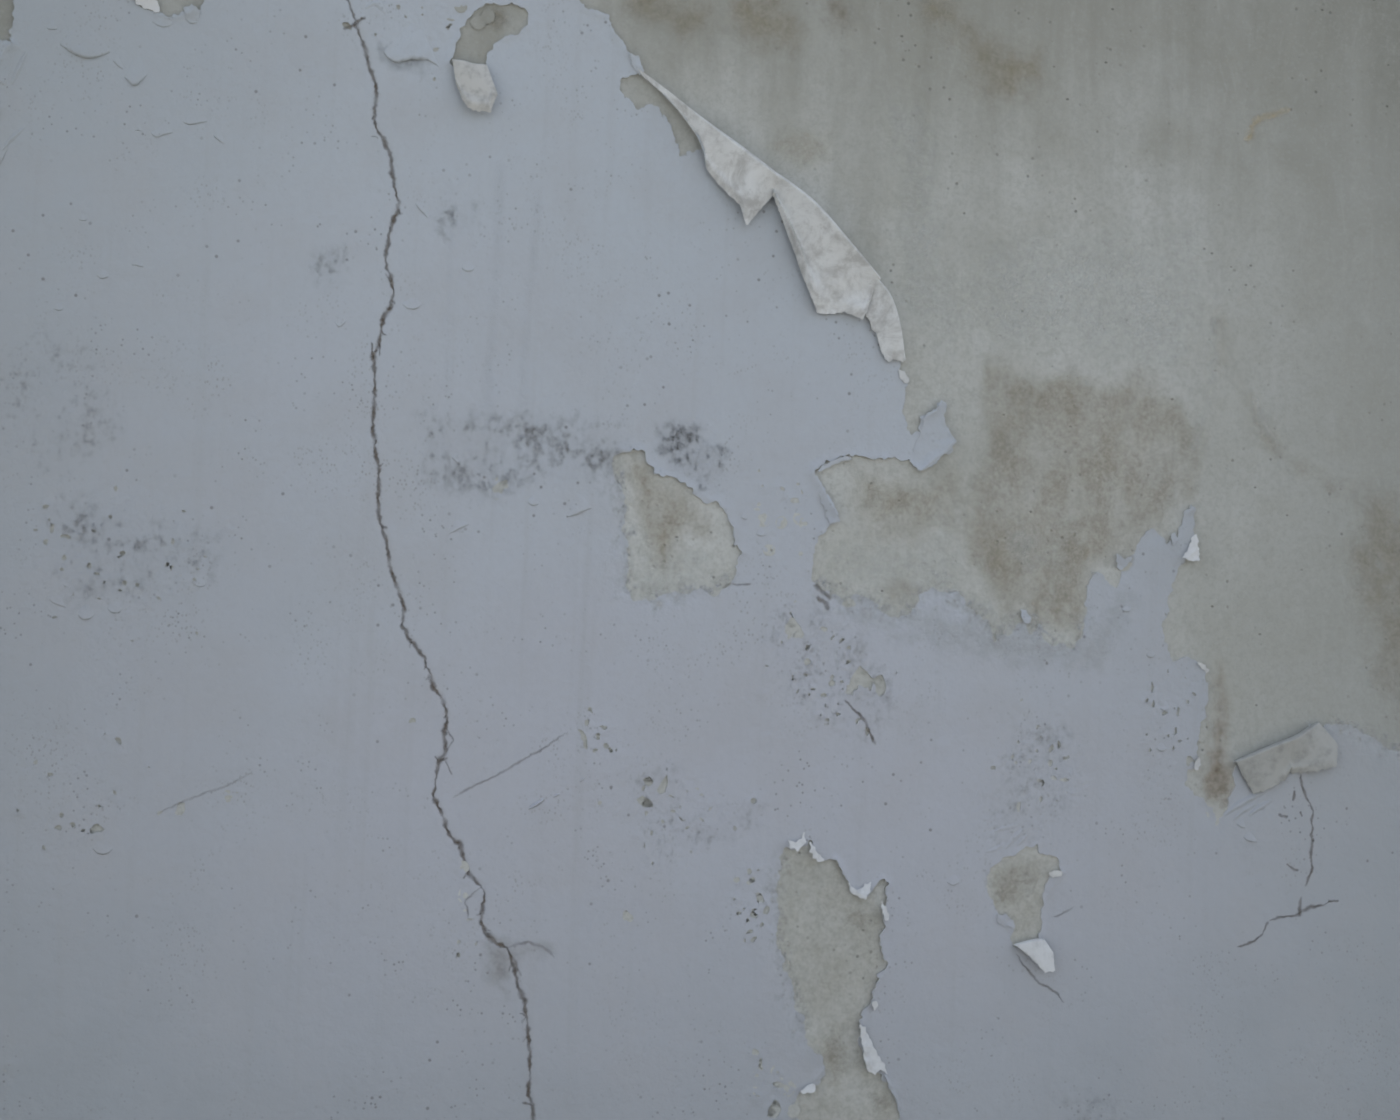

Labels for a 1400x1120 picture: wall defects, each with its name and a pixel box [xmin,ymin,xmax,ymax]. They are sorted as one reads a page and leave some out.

peeling [0,0,15,85]
peeling [135,0,204,21]
peeling [433,3,528,113]
peeling [578,0,1400,825]
crack [352,11,534,1115]
peeling [636,769,712,864]
peeling [986,844,1063,973]
peeling [733,832,902,1120]